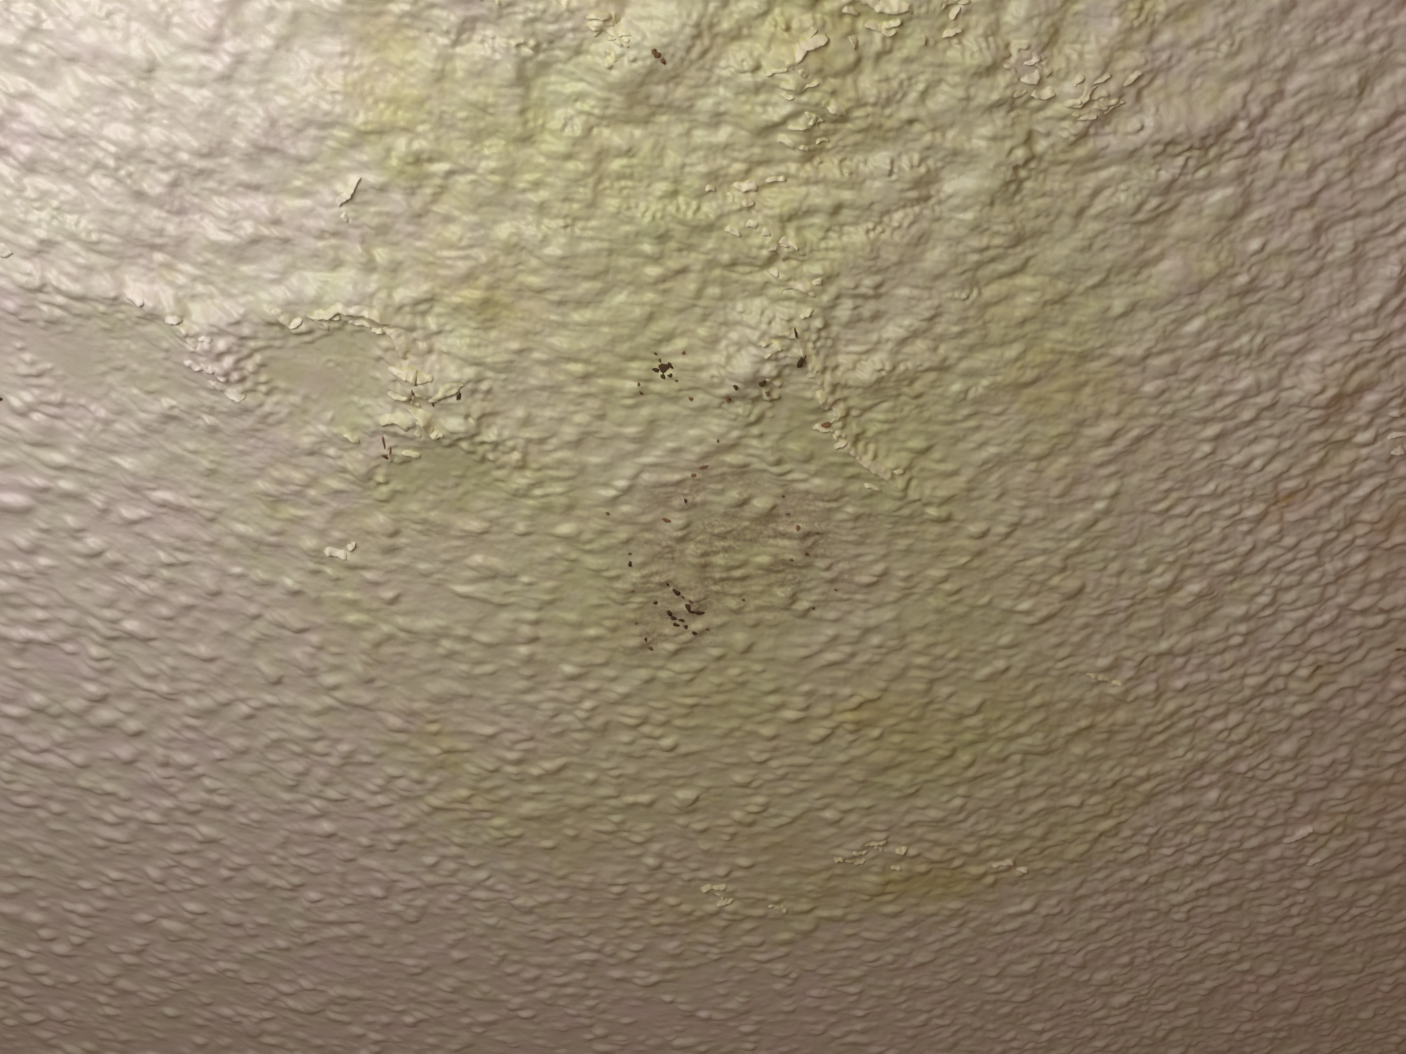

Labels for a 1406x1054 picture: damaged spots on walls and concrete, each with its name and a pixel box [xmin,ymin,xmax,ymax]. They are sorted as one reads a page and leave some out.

peeling [558,0,631,69]
peeling [842,0,915,50]
peeling [920,0,971,46]
peeling [764,27,848,152]
peeling [1004,54,1142,121]
water stain [652,351,685,382]
peeling [705,176,905,492]
water stain [653,583,709,635]